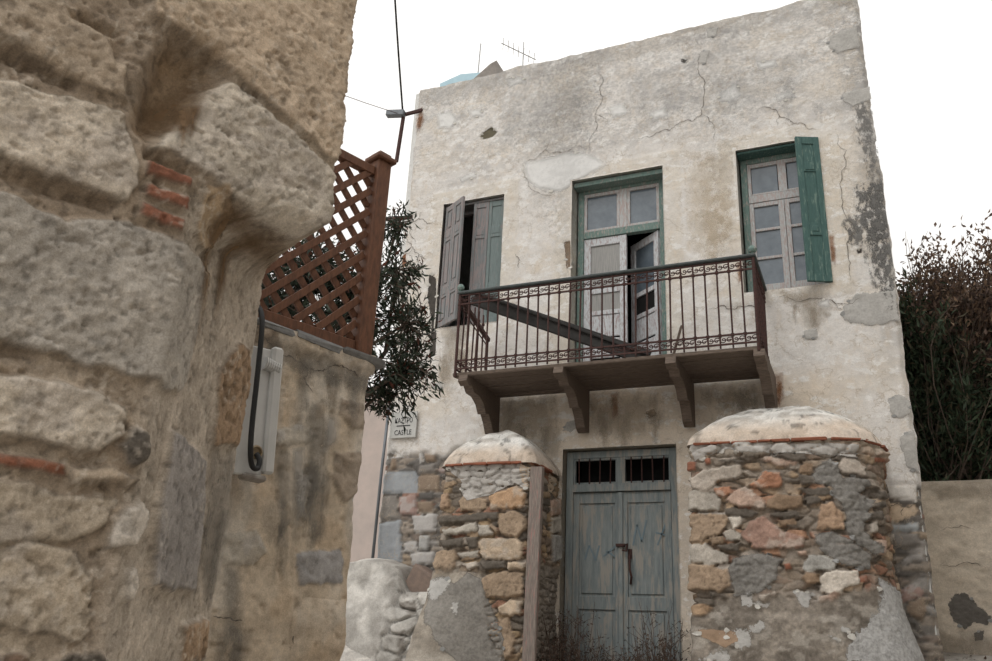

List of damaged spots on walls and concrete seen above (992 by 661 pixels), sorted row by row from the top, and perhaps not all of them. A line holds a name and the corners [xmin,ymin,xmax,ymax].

spalling [826,27,860,54]
crack [641,51,715,142]
crack [523,75,608,197]
spalling [840,290,900,325]
flaking render [689,441,859,465]
flaking render [446,464,530,500]
spalling [692,594,770,661]
peeling [792,589,816,608]
flaking render [948,592,992,641]